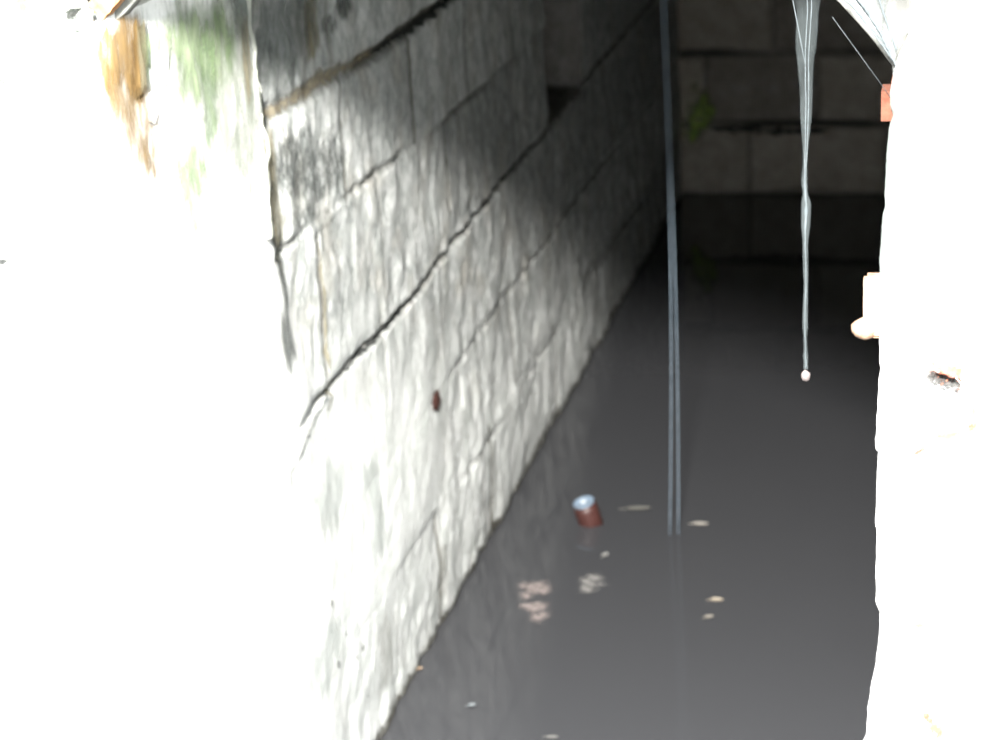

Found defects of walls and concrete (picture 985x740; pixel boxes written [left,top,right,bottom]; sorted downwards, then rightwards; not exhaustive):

corrosion [88,0,158,192]
damp [168,61,217,234]
damp [234,0,369,119]
damp [265,124,345,372]
crack [290,140,537,500]
spalling [913,358,980,460]